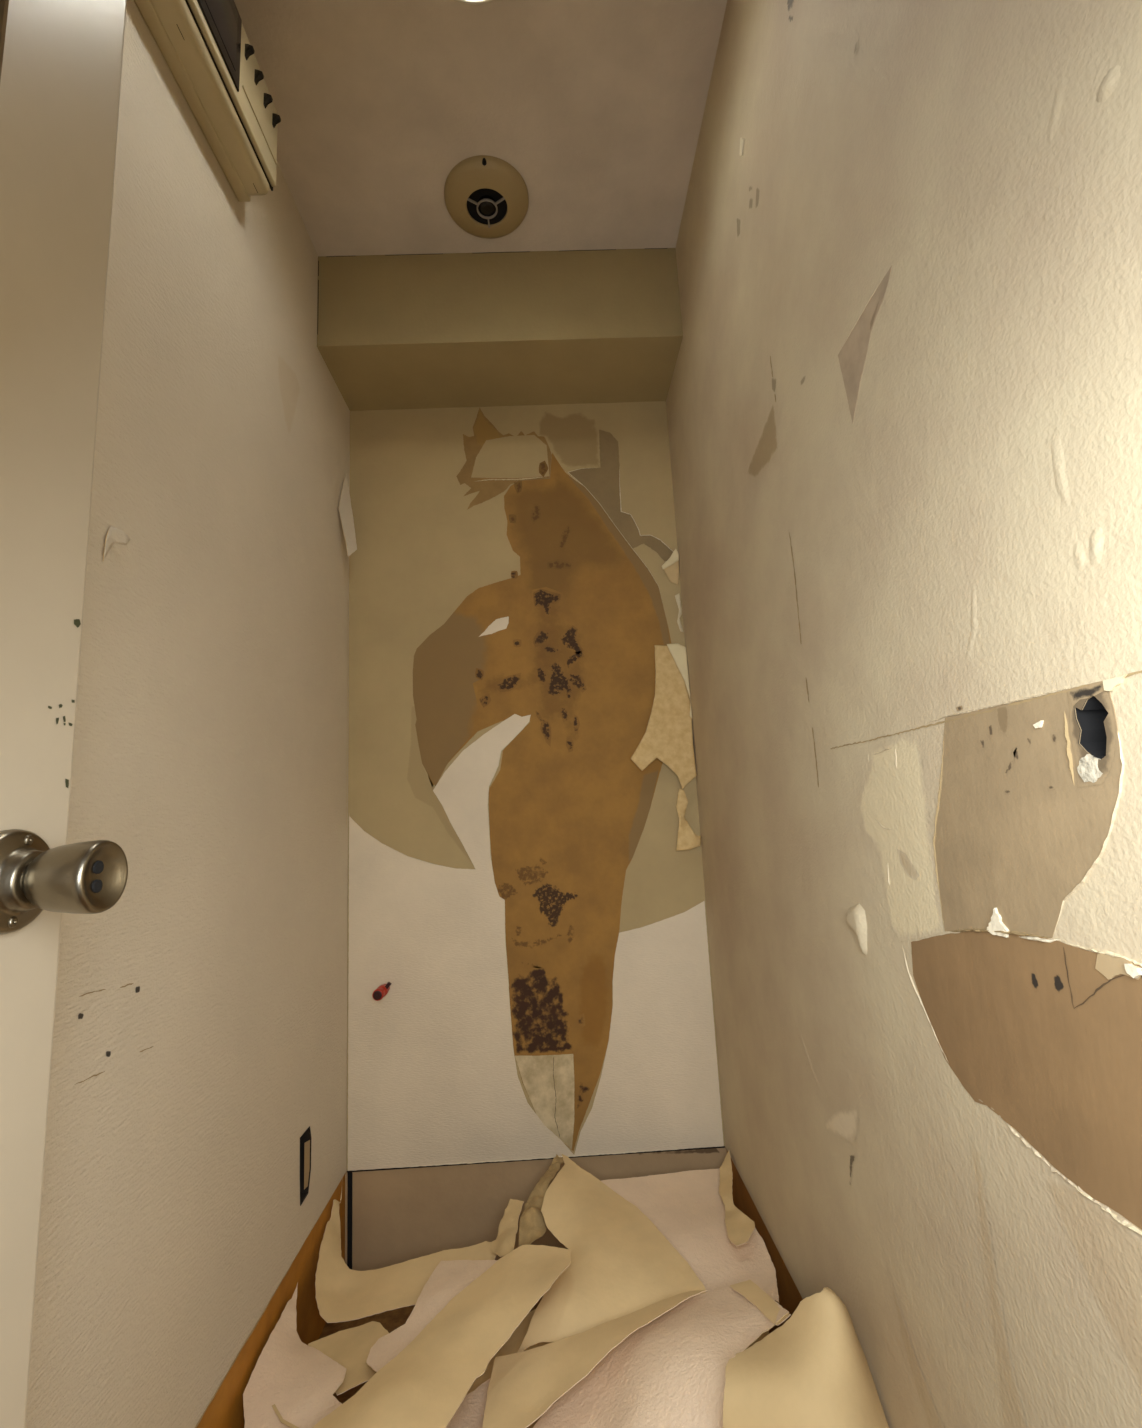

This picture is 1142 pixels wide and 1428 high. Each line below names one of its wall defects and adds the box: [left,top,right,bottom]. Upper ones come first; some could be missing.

peeling [838,266,892,423]
leakage [475,588,587,752]
peeling [413,453,671,1151]
peeling [929,674,1128,938]
leakage [496,856,585,1056]
leakage [576,1080,593,1115]
peeling [1074,1186,1142,1236]